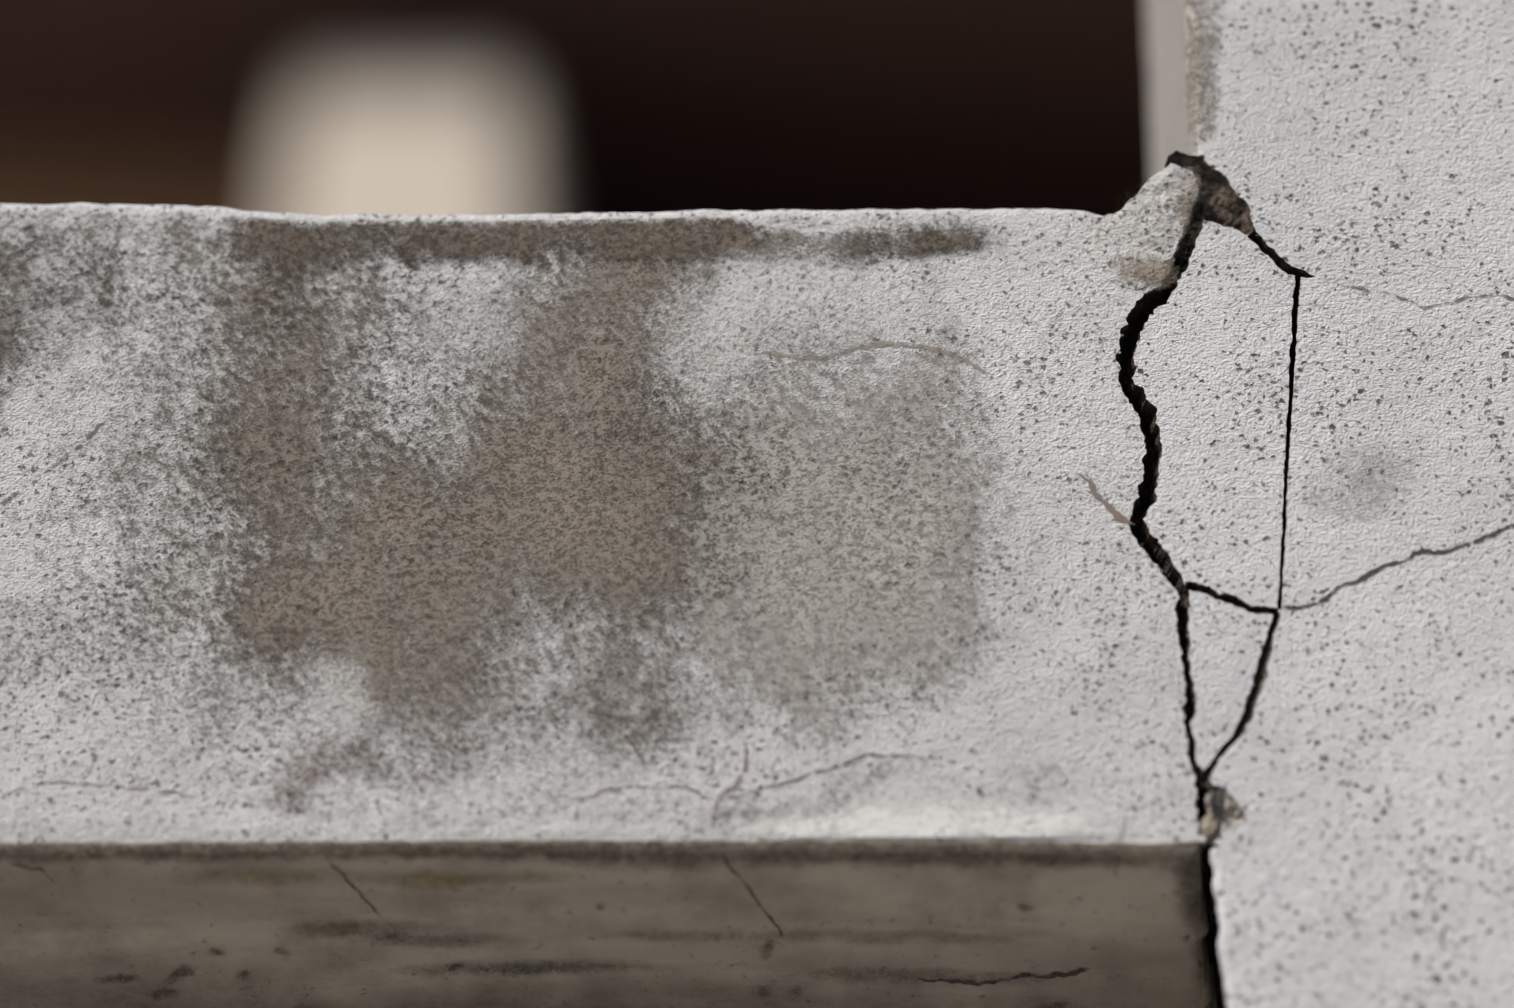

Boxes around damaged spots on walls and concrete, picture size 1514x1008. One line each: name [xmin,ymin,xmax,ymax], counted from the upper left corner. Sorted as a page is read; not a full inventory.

water stain [0,212,1002,766]
crack [1076,202,1514,1008]